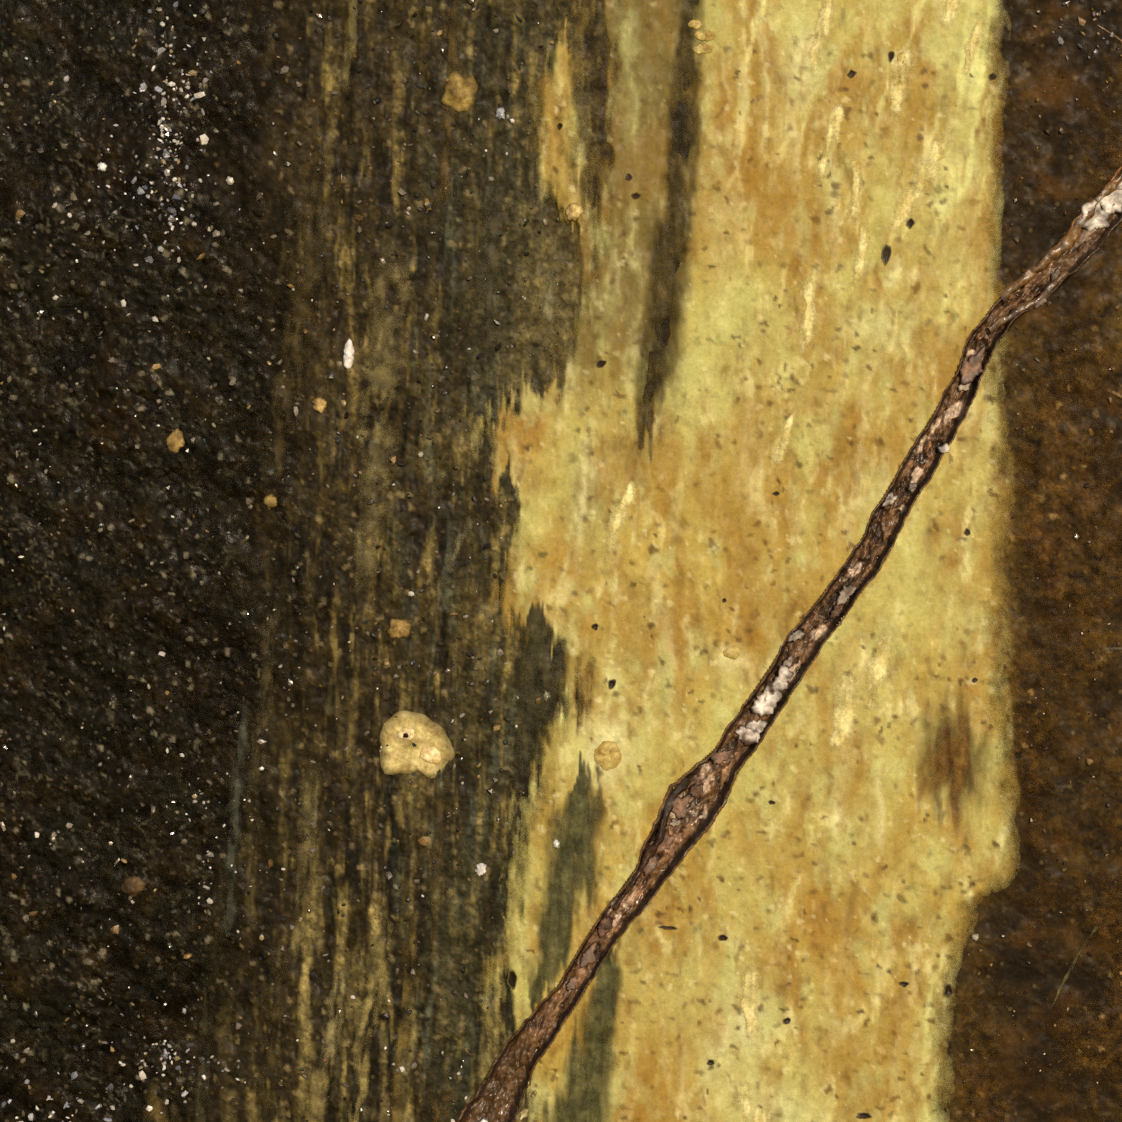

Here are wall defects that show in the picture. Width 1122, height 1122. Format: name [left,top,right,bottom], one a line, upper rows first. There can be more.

damp [342,0,358,86]
crack [1097,24,1122,43]
damp [355,262,411,581]
damp [447,522,471,567]
damp [475,0,1014,1122]
crack [456,166,1122,1122]
damp [308,978,345,1122]
damp [349,931,391,1122]
damp [392,760,452,1122]